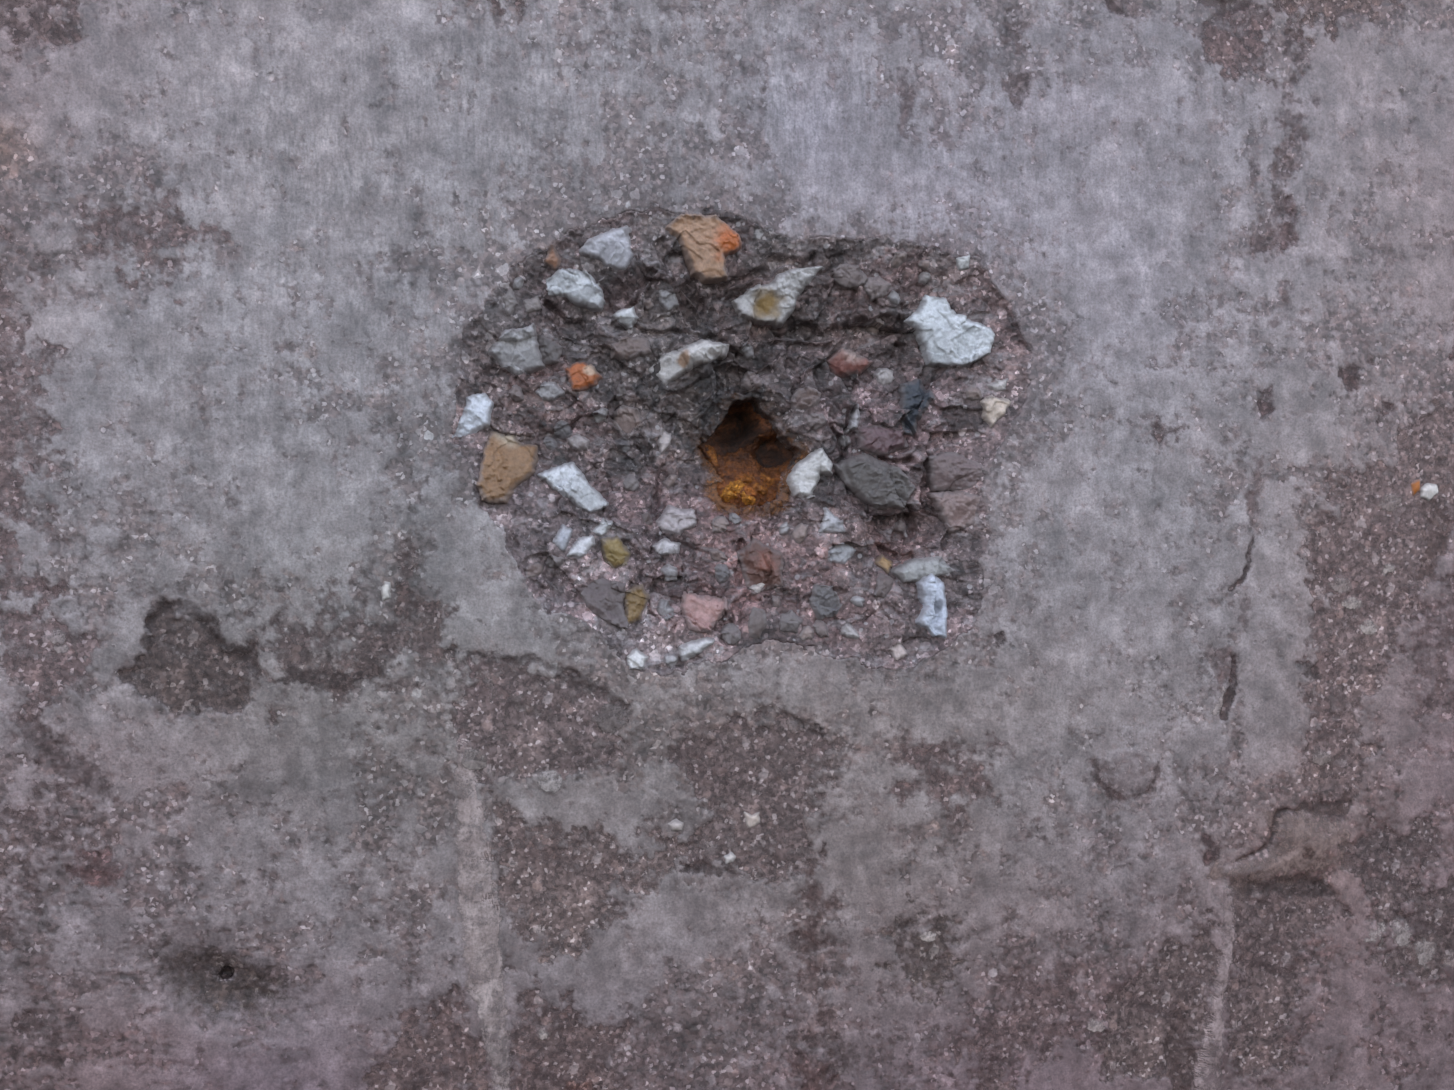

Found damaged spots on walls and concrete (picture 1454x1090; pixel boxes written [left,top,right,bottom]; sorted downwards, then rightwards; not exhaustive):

spalling [451,202,1032,677]
rust [698,402,810,519]
crack [1228,538,1254,591]
crack [1212,656,1237,720]